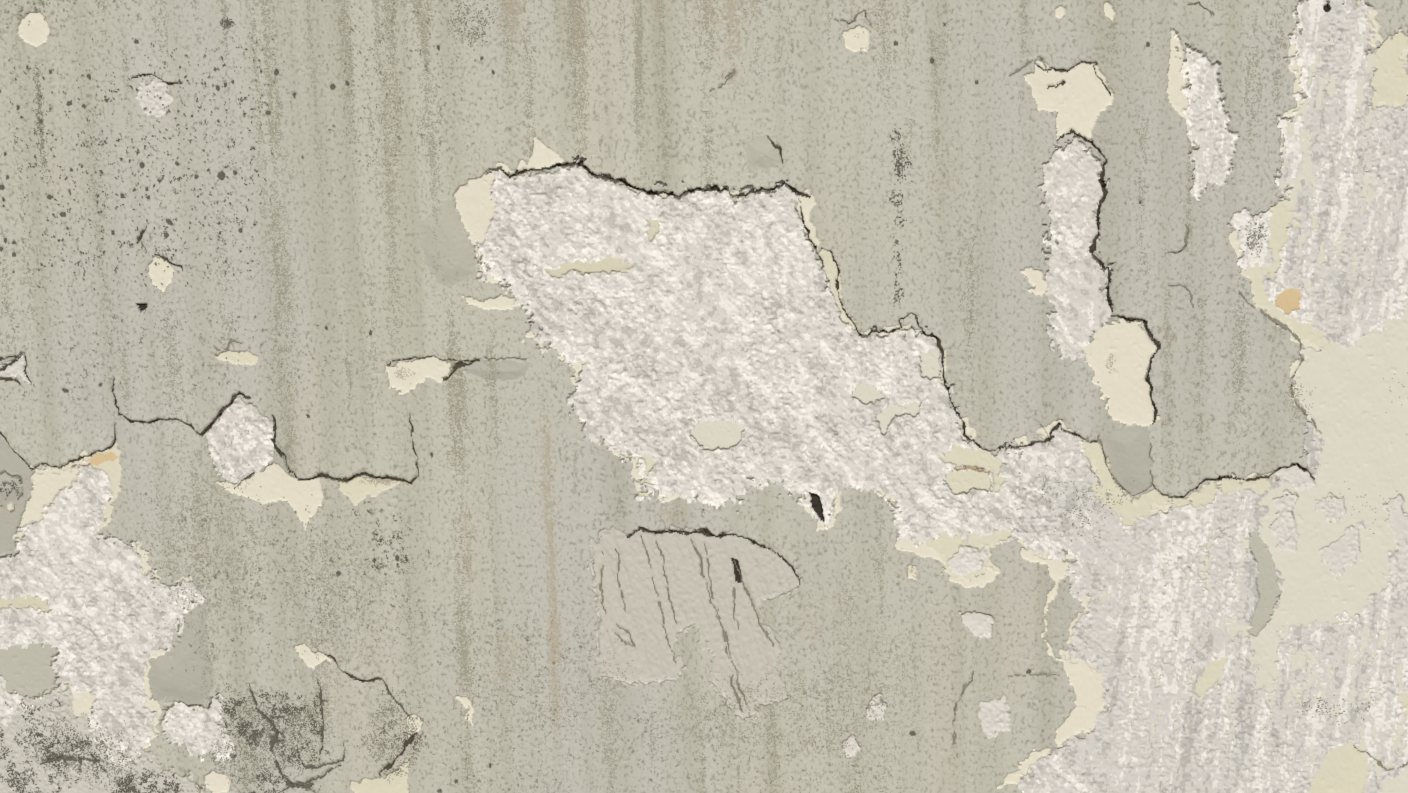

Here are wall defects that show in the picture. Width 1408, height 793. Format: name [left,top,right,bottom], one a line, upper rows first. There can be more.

damp [0,67,48,360]
damp [82,1,134,415]
peeling [1174,33,1240,208]
peeling [1227,0,1408,381]
crack [0,351,31,384]
crack [0,379,419,497]
peeling [205,397,275,483]
peeling [468,136,1408,793]
damp [0,692,205,793]
peeling [0,448,238,793]
peeling [295,644,332,669]
crack [249,654,417,791]